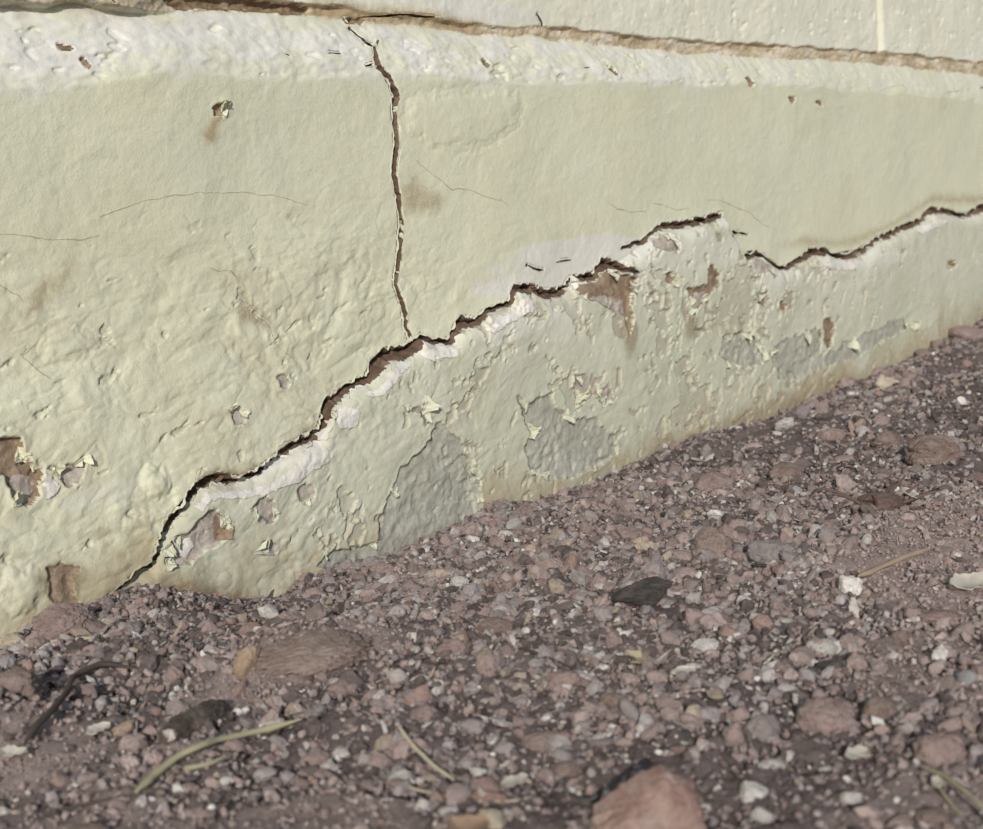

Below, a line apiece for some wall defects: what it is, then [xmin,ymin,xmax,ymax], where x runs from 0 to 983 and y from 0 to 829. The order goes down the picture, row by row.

spalling [213,100,232,117]
crack [109,11,983,595]
spalling [568,269,639,331]
peeling [666,265,719,316]
peeling [719,317,921,380]
flaking render [873,377,900,390]
spalling [517,374,620,481]
flaking render [774,417,794,431]
spalling [0,437,94,507]
spalling [318,395,485,568]
peeling [159,510,234,571]
peeling [47,563,80,604]